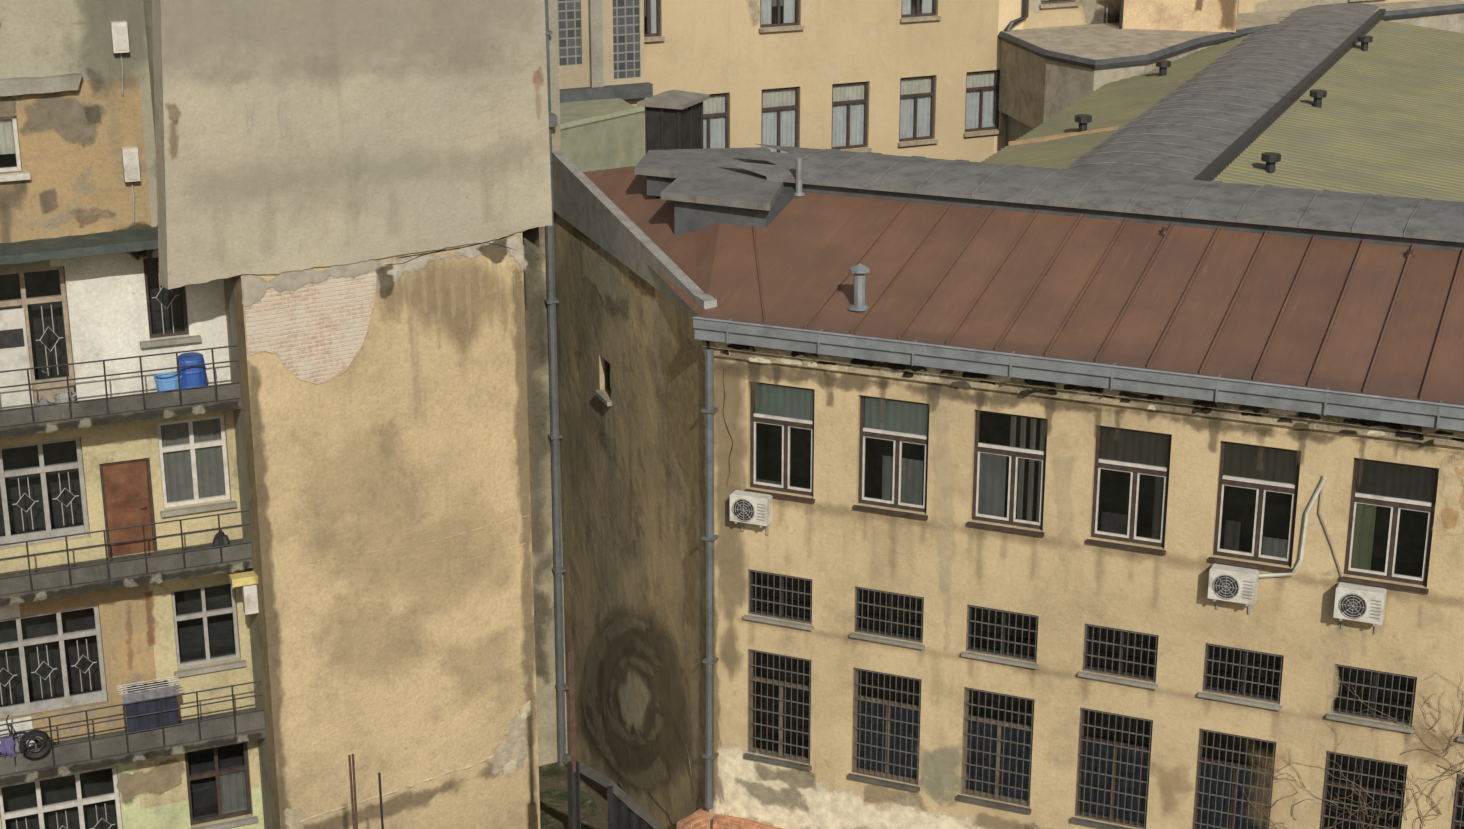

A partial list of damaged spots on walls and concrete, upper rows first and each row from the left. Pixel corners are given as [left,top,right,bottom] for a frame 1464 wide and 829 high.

flaking render [0,94,103,146]
flaking render [40,190,114,228]
flaking render [241,235,528,385]
flaking render [660,340,1464,829]
damp [608,658,694,790]